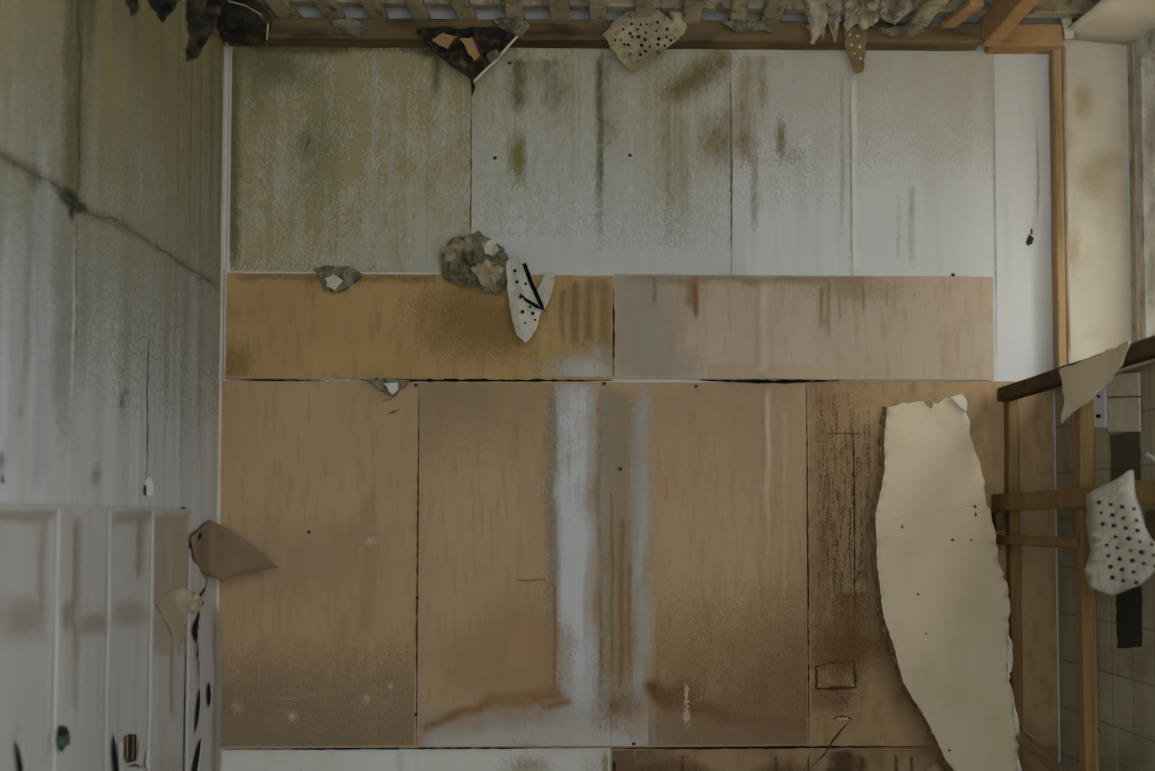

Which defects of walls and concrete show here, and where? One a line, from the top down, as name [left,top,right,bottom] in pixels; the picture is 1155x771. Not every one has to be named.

damp [0,510,189,725]
crack [0,0,222,370]
damp [0,0,259,488]
peeling [191,520,279,581]
damp [212,46,994,771]
peeling [1012,695,1020,738]